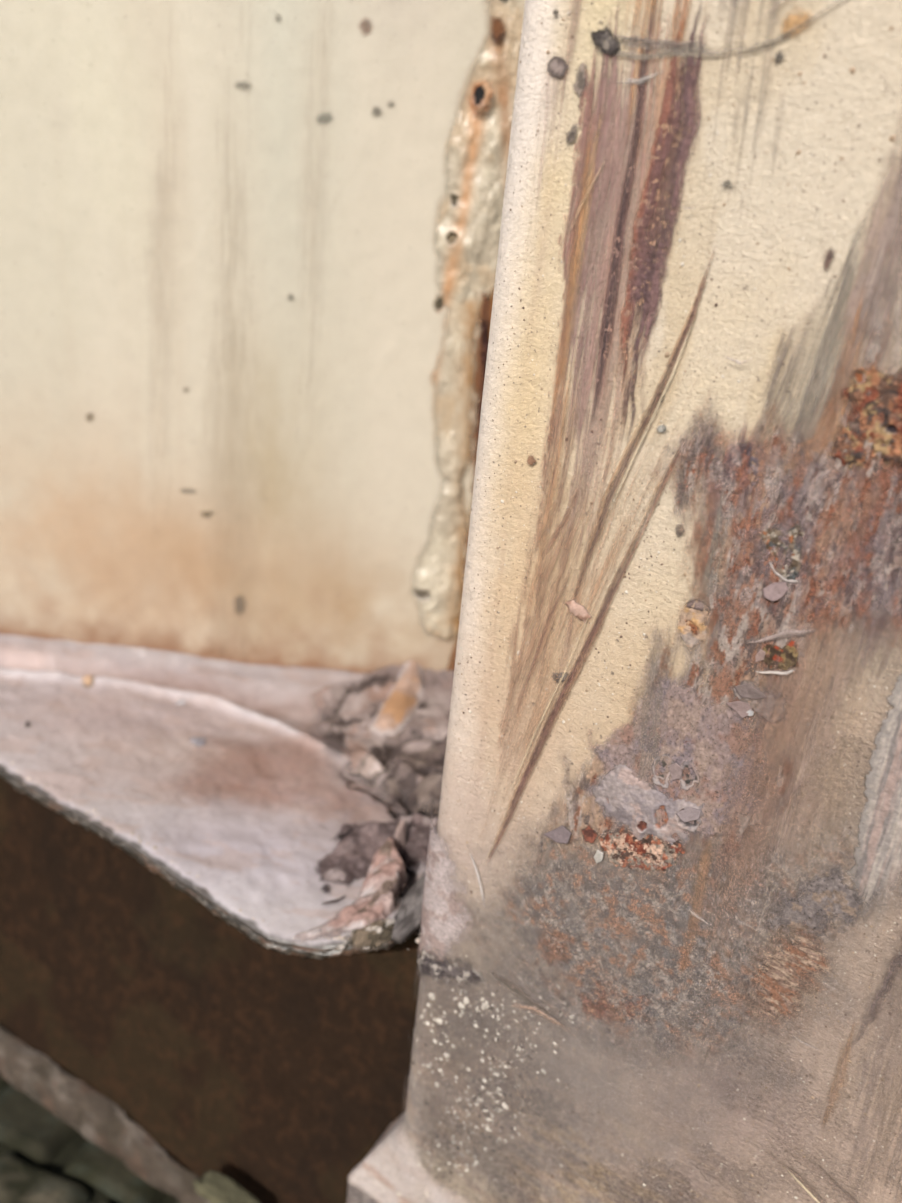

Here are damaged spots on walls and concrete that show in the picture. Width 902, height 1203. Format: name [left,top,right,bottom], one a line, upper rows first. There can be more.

corrosion [490,17,505,43]
corrosion [469,288,494,493]
corrosion [529,0,703,604]
corrosion [447,638,458,671]
corrosion [509,156,902,1057]
peeling [317,808,469,956]
efflorescence [412,982,590,1176]